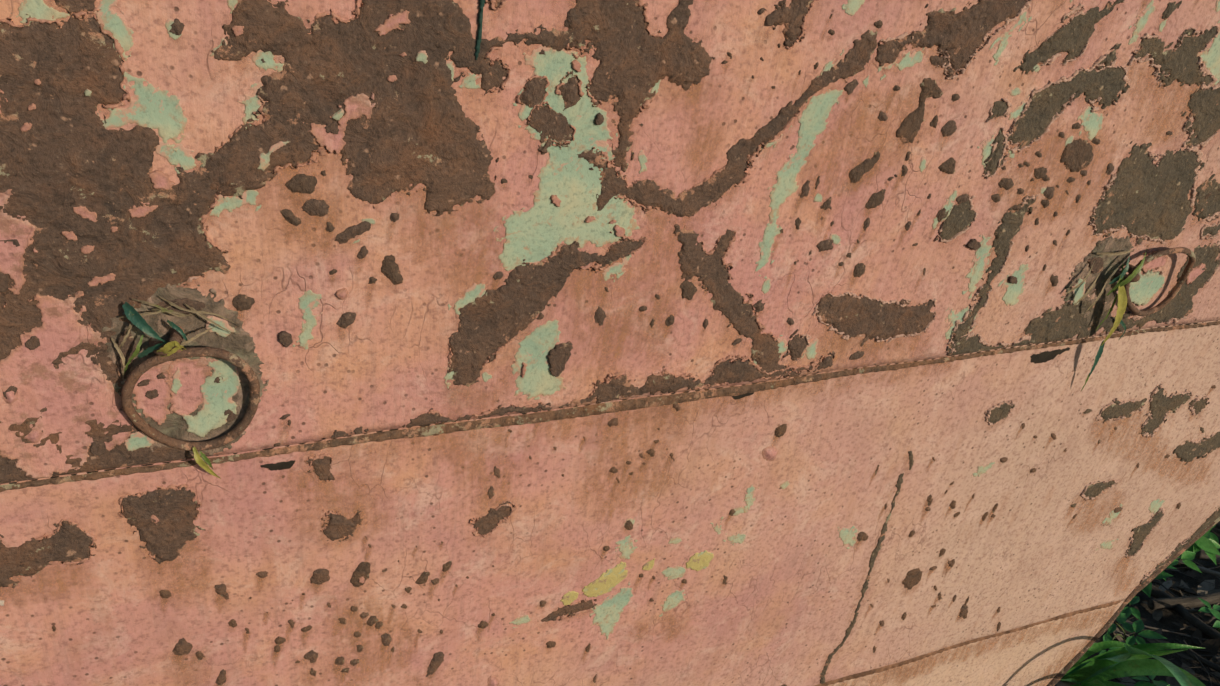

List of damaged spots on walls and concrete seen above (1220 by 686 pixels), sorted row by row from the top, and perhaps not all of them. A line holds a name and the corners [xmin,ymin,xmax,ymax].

spalling [280,170,399,259]
peeling [493,45,640,280]
rust [0,0,1220,484]
peeling [754,78,969,294]
spalling [991,106,1104,225]
peeling [182,359,241,438]
peeling [511,318,573,401]
rust [300,453,363,542]
rust [469,466,517,538]
crack [820,451,914,684]
rust [1070,480,1120,526]
rust [1115,498,1220,590]